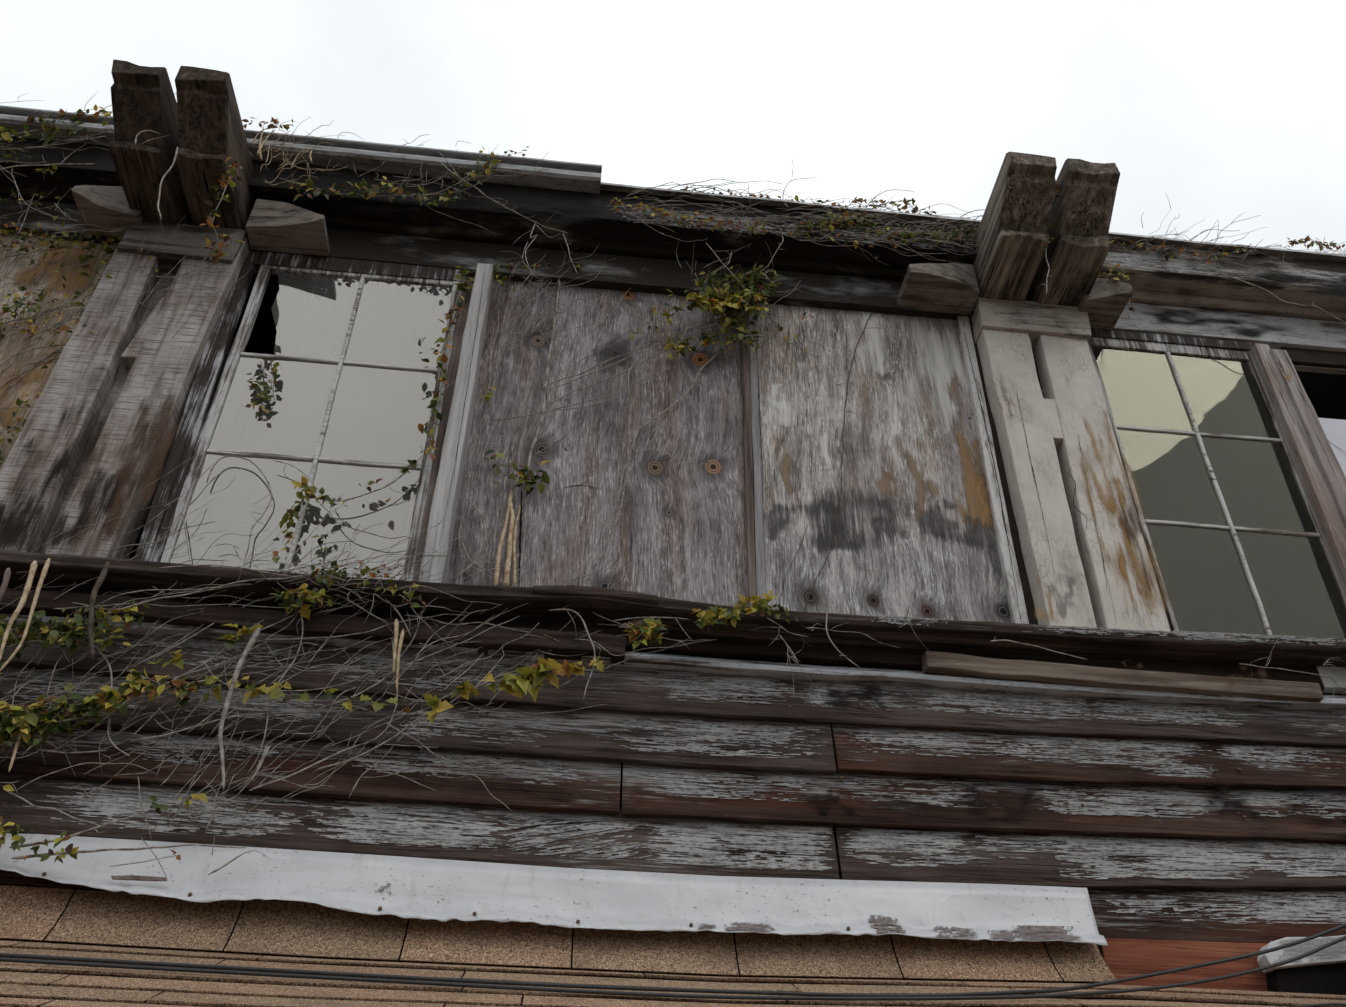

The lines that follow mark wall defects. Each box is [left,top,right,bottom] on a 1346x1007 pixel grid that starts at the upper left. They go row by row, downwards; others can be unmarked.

leakage [949,353,963,398]
leakage [762,384,896,552]
leakage [896,436,998,577]
peeling [3,672,170,709]
peeling [115,636,307,671]
peeling [181,686,322,722]
peeling [329,651,529,691]
peeling [645,670,1249,727]
peeling [124,732,300,765]
peeling [328,707,1346,818]
peeling [23,782,1346,964]